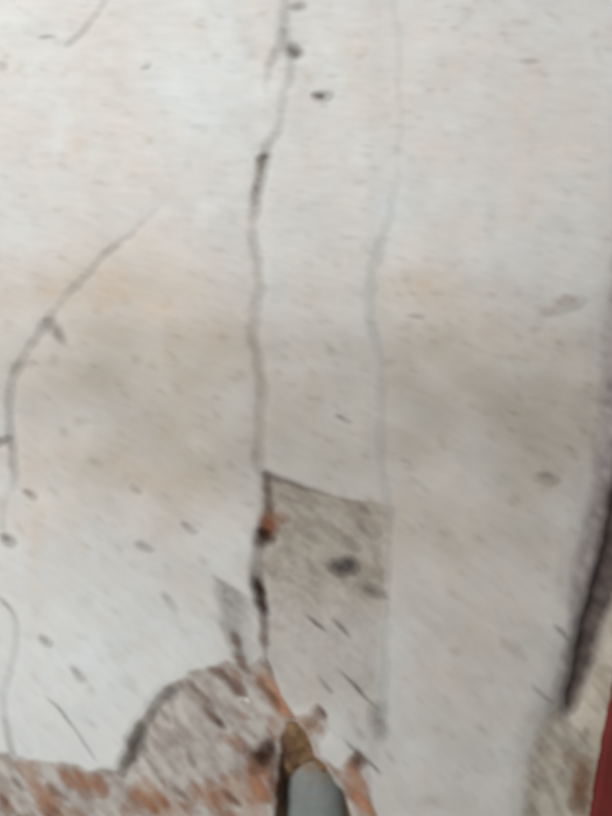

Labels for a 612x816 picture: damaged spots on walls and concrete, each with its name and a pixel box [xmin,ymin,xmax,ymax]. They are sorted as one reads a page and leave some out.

crack [0,201,165,530]
crack [240,149,274,476]
crack [0,594,21,760]
crack [43,694,99,764]
spalling [0,469,395,816]
rust [257,516,276,543]